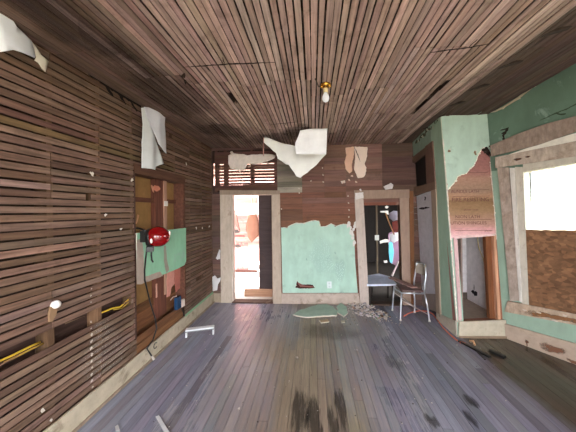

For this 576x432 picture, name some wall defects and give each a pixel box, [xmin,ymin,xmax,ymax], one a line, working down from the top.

peeling [228,151,275,173]
peeling [342,147,357,184]
spalling [474,146,497,239]
peeling [283,220,356,246]
peeling [522,309,576,323]
peeling [541,343,576,364]
water stain [291,392,323,432]
water stain [327,392,347,432]